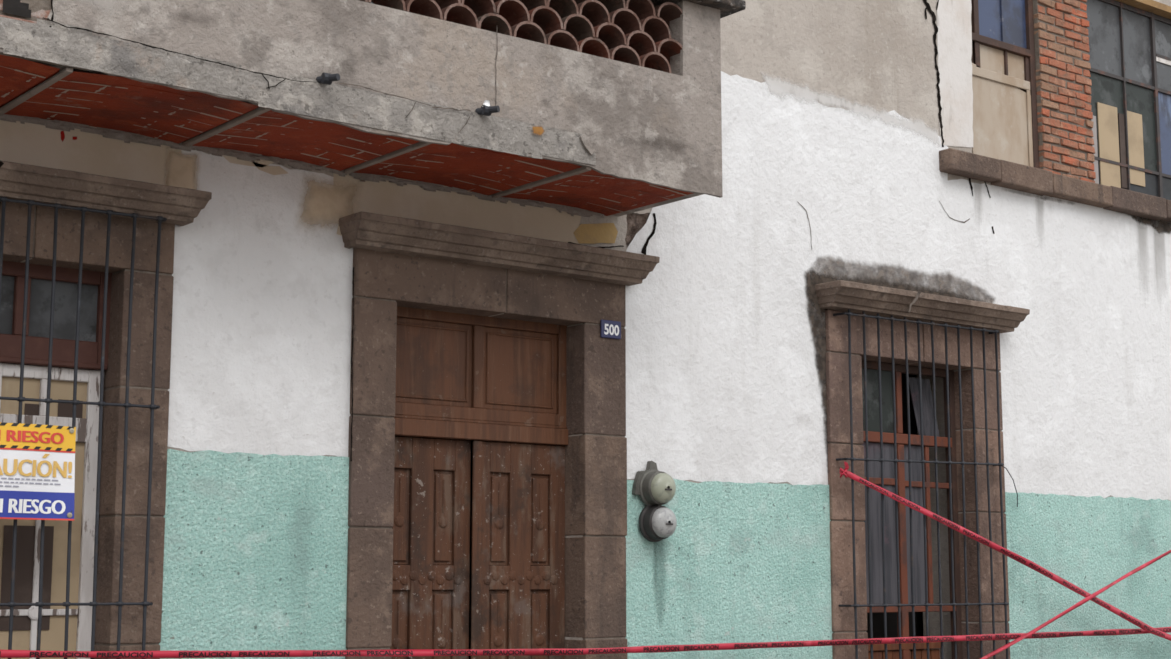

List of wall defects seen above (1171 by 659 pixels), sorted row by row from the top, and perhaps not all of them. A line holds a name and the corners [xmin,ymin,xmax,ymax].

hole [3,0,31,18]
crack [923,0,944,147]